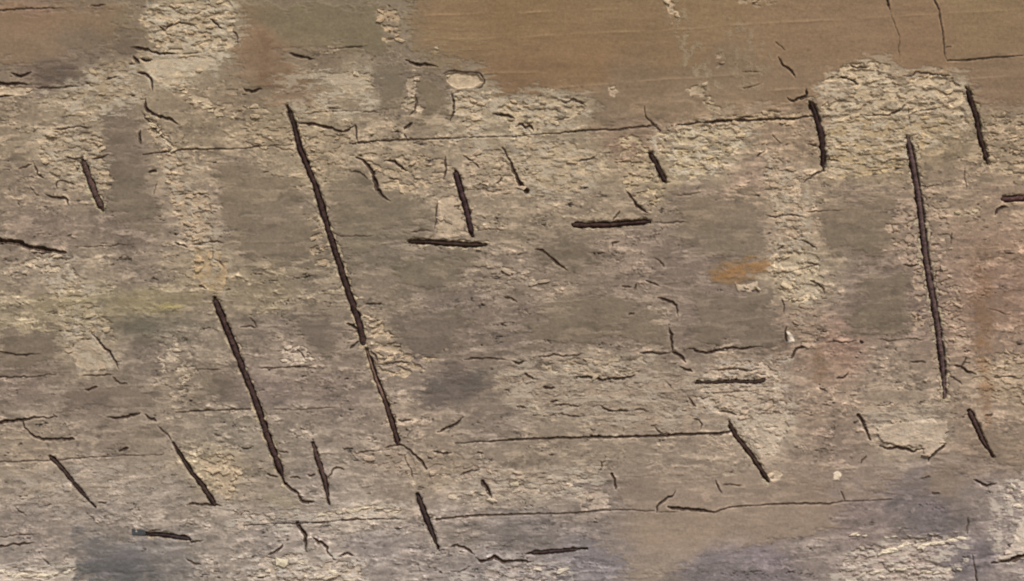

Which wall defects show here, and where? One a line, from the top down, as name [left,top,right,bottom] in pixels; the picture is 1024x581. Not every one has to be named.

spalling [138,0,612,511]
crack [107,19,812,201]
crack [245,258,891,578]
spalling [572,60,1024,406]